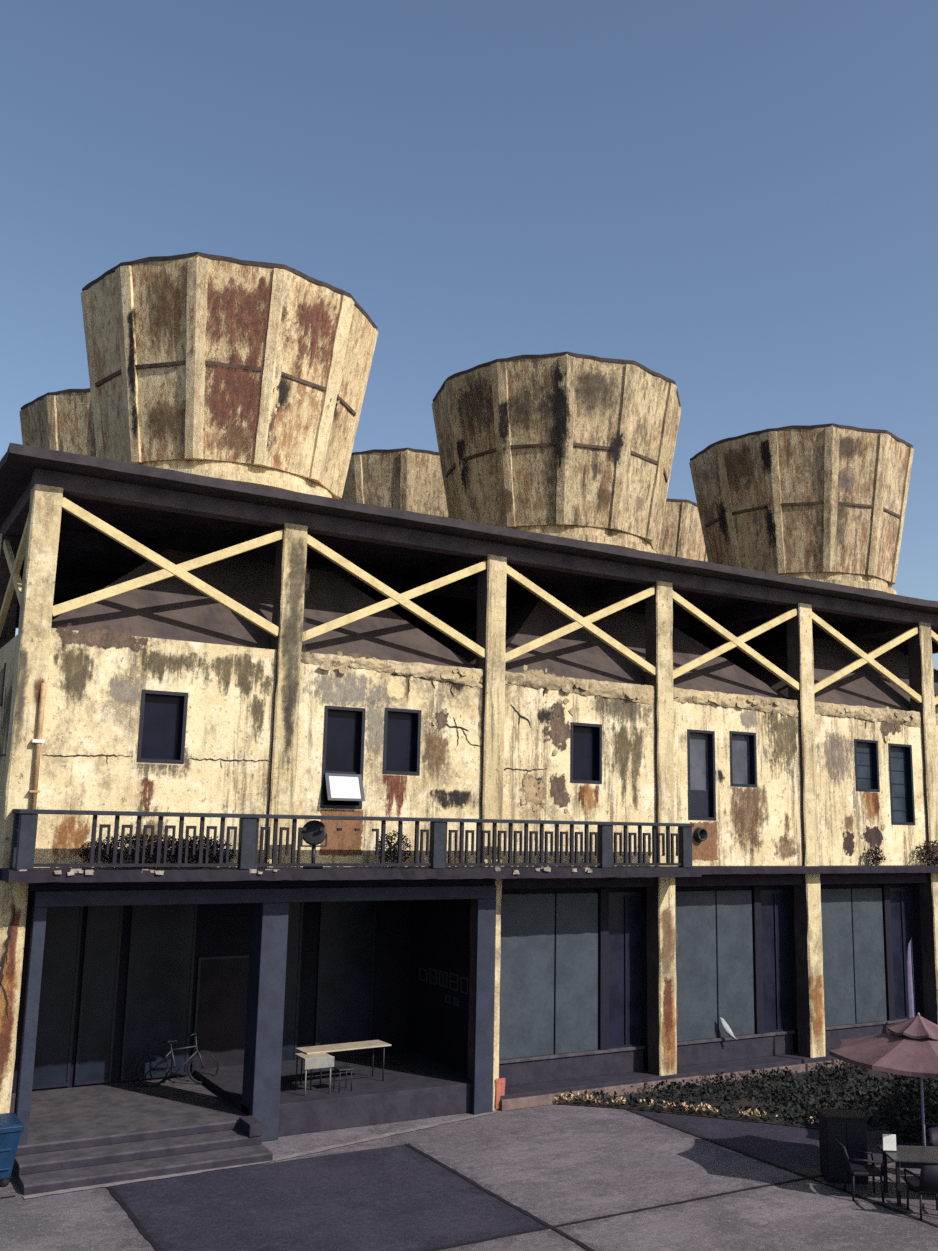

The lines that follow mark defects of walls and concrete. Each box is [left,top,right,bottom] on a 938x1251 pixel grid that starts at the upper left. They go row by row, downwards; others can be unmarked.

corrosion [146,272,341,464]
damp [457,363,619,493]
damp [54,645,93,700]
damp [107,539,309,763]
corrosion [383,775,407,817]
crack [390,674,596,747]
crack [504,767,547,795]
peeling [509,665,565,686]
peeling [543,698,574,755]
damp [591,696,652,809]
corrosion [0,903,21,1090]
corrosion [660,908,678,1074]